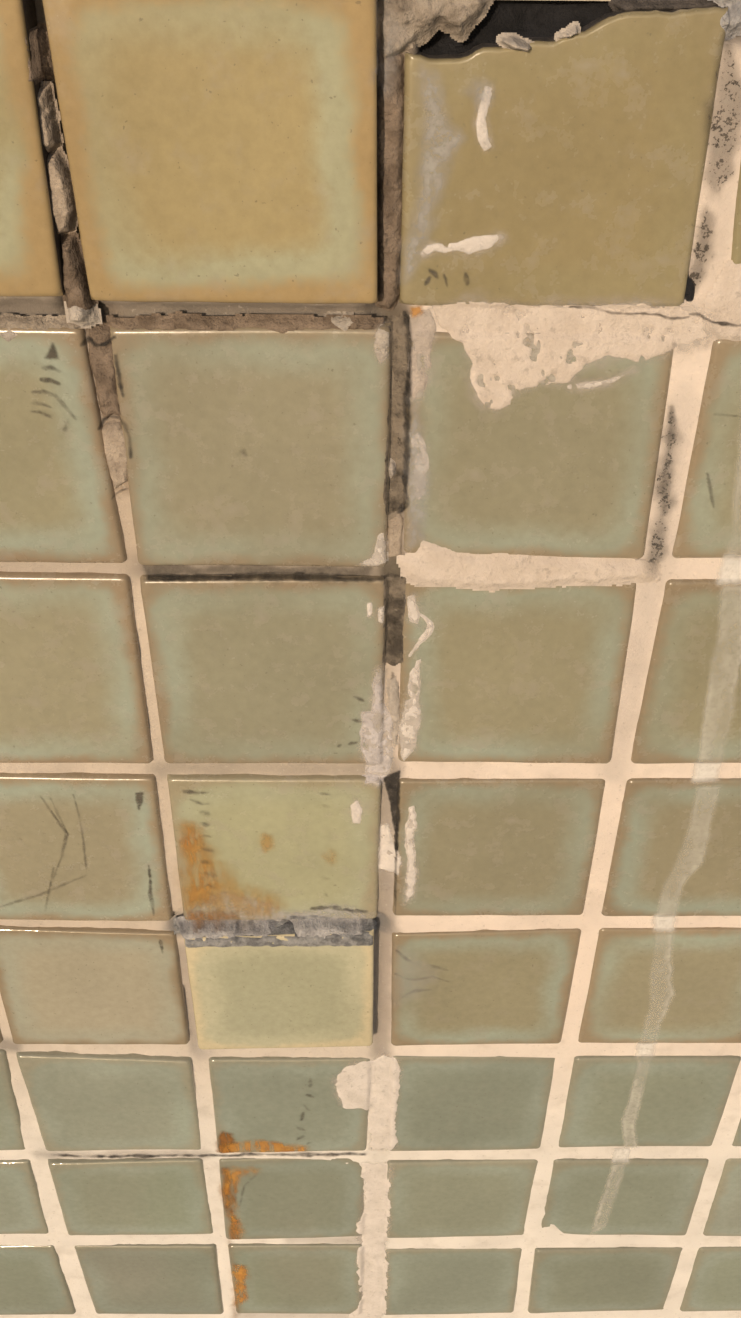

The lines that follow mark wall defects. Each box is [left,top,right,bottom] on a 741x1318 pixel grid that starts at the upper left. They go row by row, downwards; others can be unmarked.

spalling [420,0,719,55]
spalling [683,274,695,303]
crack [81,337,123,429]
rust [182,827,234,925]
rust [218,1132,304,1153]
rust [224,1170,246,1239]
rust [233,1266,247,1304]